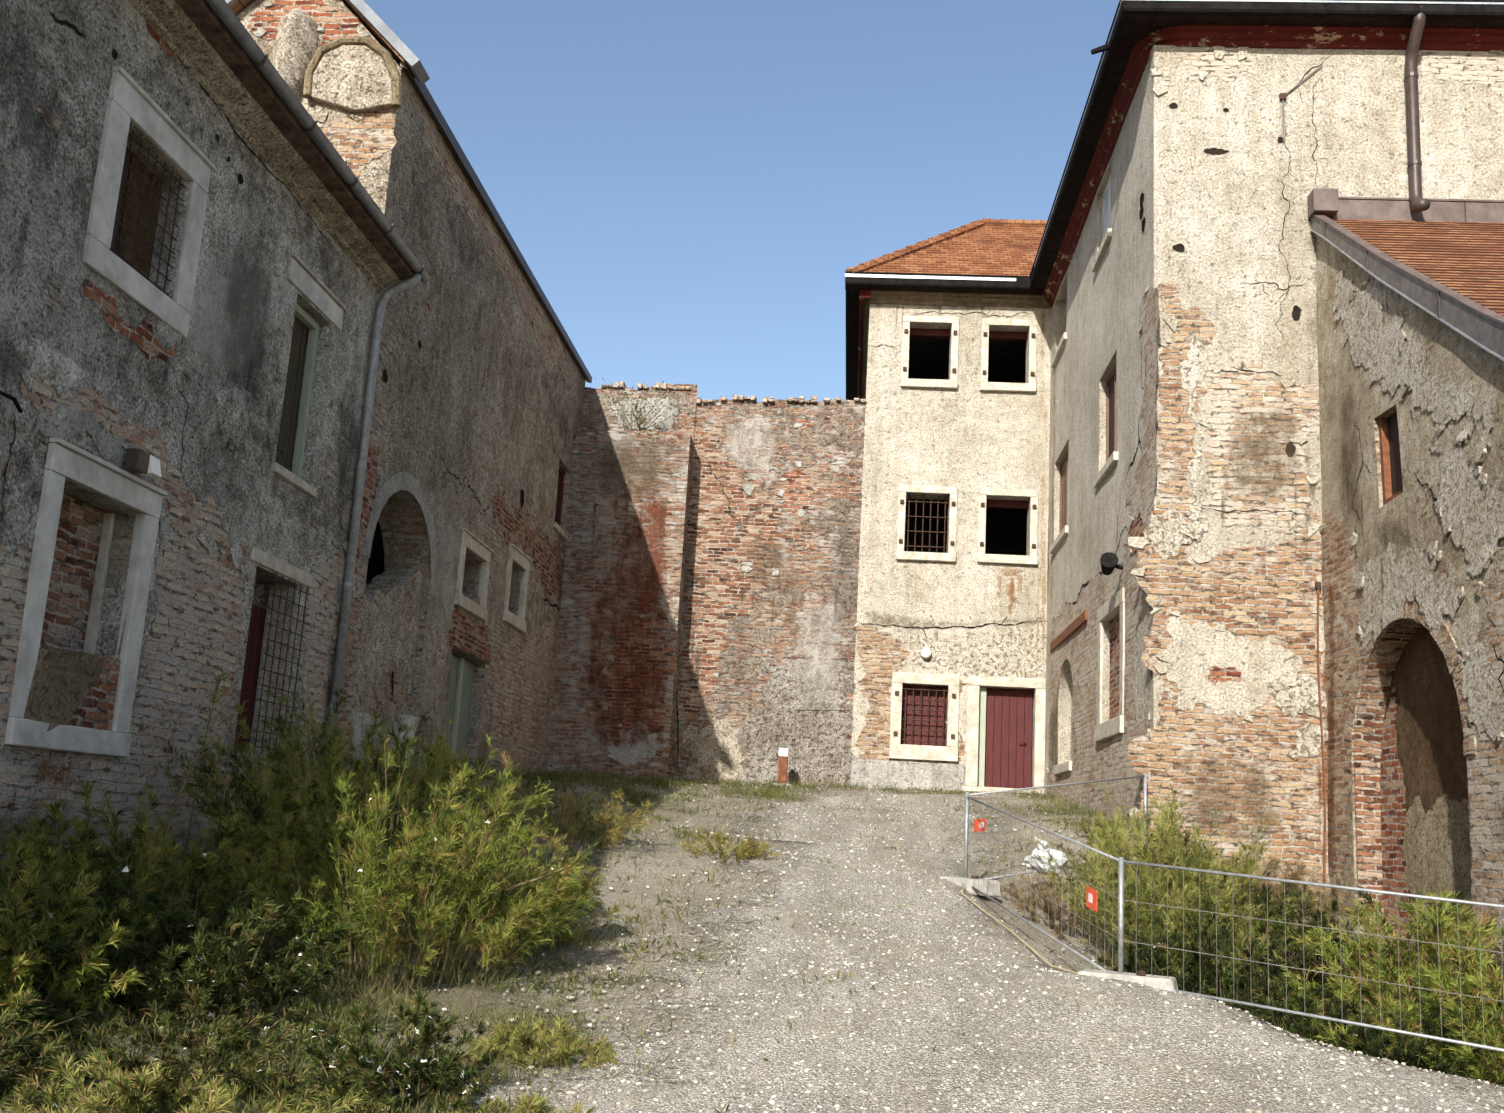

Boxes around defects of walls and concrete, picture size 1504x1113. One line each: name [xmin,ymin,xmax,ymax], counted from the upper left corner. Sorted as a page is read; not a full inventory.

flaking render [0,364,251,892]
spalling [81,278,179,364]
damp [587,441,666,746]
flaking render [849,621,968,767]
flaking render [1046,281,1365,896]
crack [1211,54,1334,376]
flaking render [1380,687,1417,950]
peeling [1427,504,1452,561]
peeling [1456,428,1487,484]
flaking render [1442,525,1504,950]